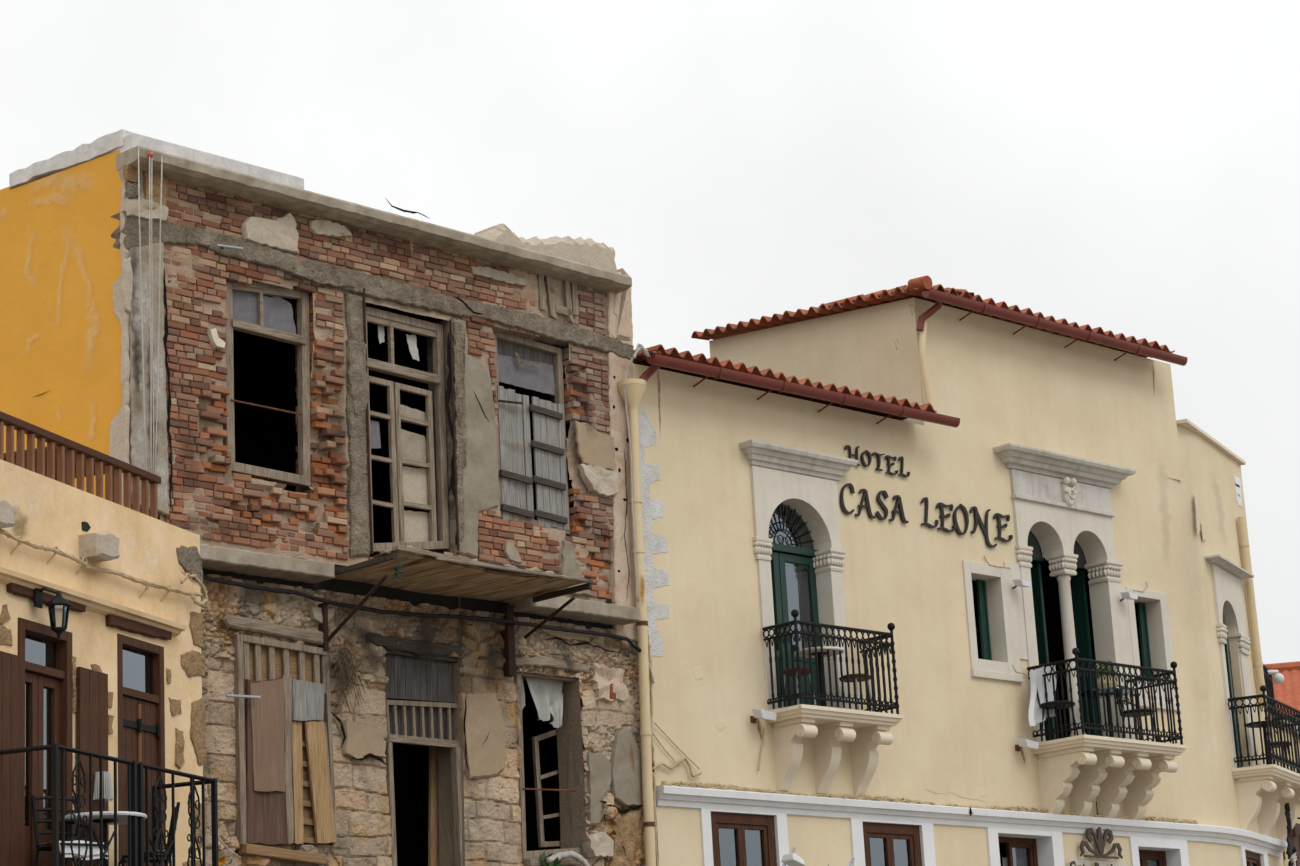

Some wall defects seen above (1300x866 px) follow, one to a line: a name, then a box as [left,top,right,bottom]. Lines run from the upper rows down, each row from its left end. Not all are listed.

spalling [123,164,168,222]
spalling [121,257,152,337]
spalling [292,264,355,288]
peeling [140,357,164,406]
spalling [346,340,370,416]
peeling [136,424,167,499]
spalling [452,321,554,587]
spalling [590,663,629,703]